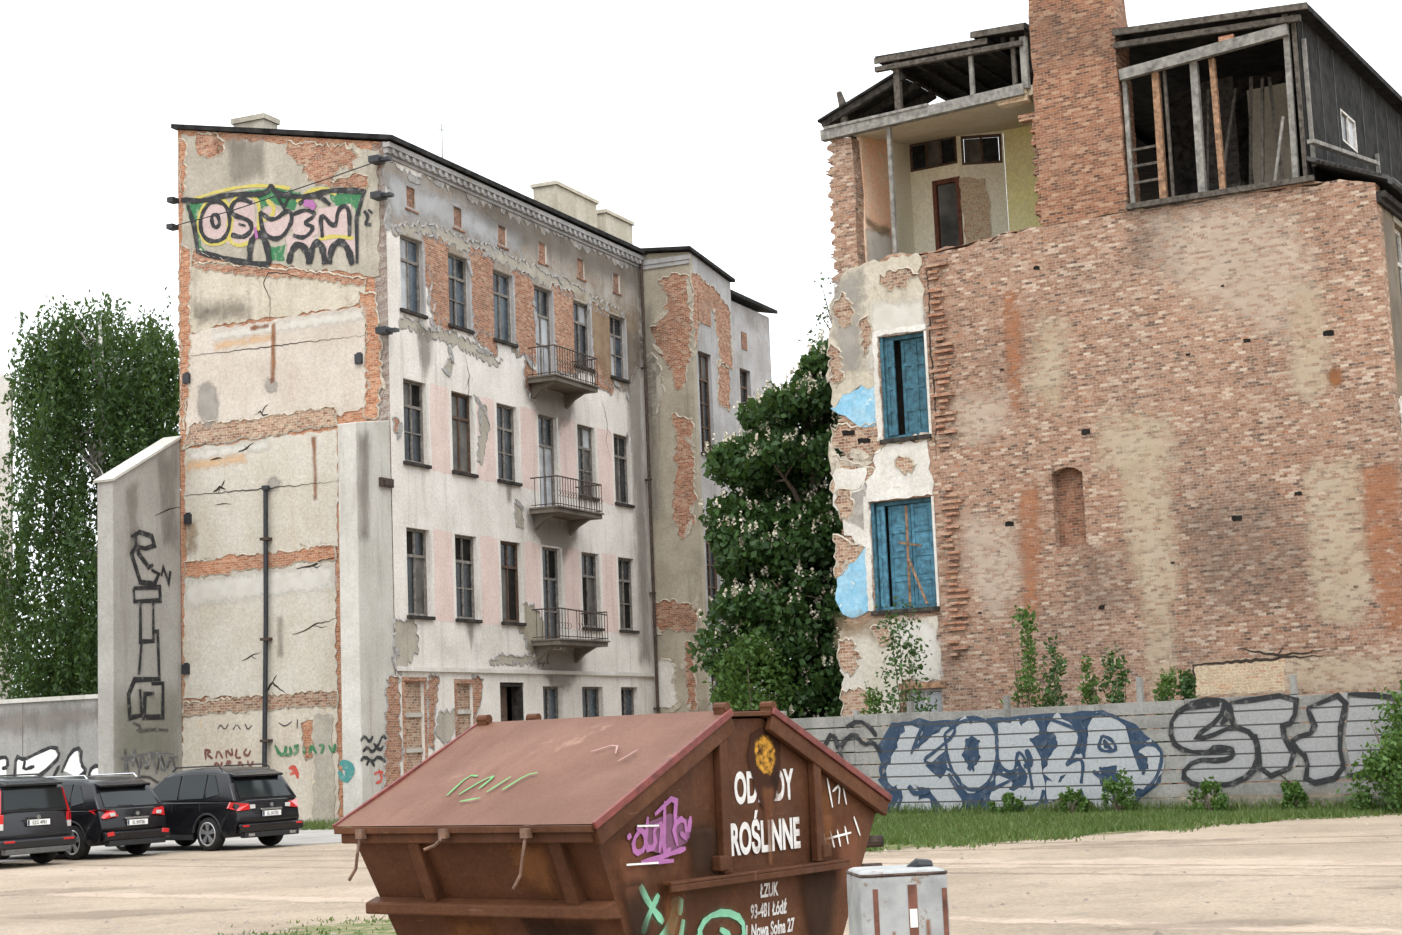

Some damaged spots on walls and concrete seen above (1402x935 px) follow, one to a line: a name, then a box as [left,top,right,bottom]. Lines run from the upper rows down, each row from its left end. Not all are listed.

spalling [178,131,227,193]
spalling [176,243,404,450]
peeling [285,140,734,540]
spalling [826,343,845,388]
spalling [831,291,874,358]
spalling [828,422,933,579]
spalling [183,542,337,579]
spalling [182,689,339,762]
spalling [382,617,420,789]
peeling [426,601,550,751]
spalling [652,596,699,713]
spalling [837,636,872,716]